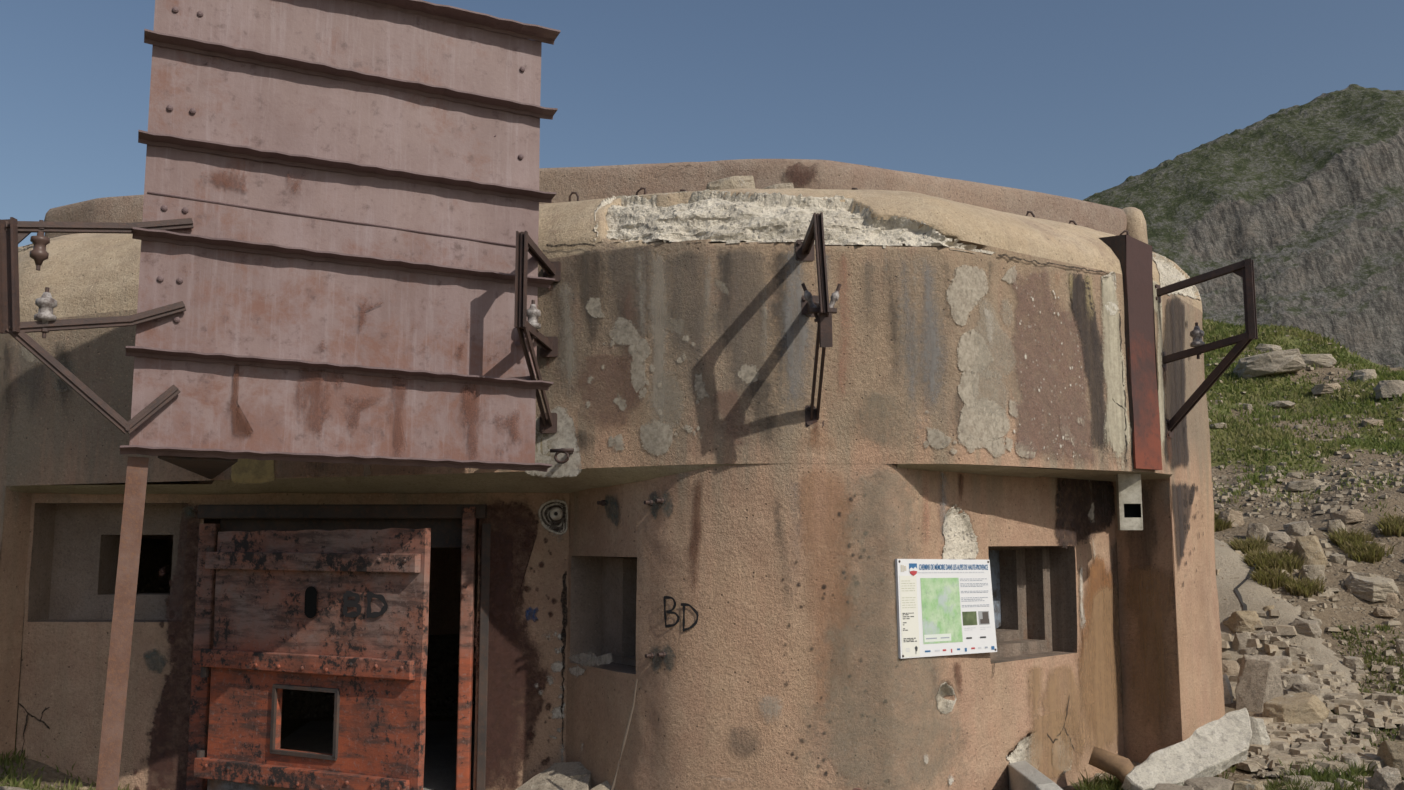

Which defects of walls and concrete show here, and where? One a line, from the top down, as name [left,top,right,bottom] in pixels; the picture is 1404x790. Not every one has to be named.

rust [231,366,253,436]
leakage [527,406,582,477]
leakage [567,251,664,424]
leakage [764,253,809,398]
spalling [585,189,1036,459]
spalling [942,504,979,559]
leakage [1029,273,1204,778]
leakage [476,501,557,790]
spalling [1007,732,1035,765]